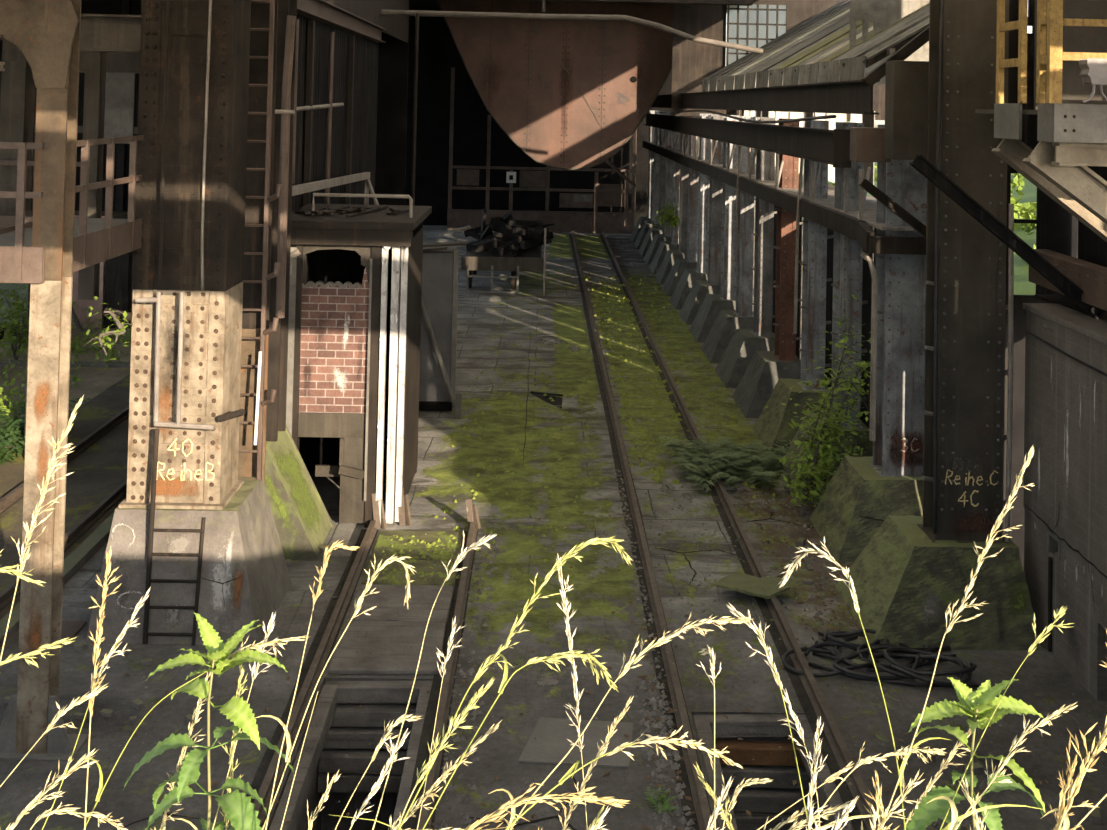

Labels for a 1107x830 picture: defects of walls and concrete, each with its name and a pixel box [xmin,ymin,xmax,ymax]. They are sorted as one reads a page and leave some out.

rust [35,384,49,418]
rust [38,441,48,481]
rust [889,431,924,466]
leakage [1064,398,1081,482]
crack [1025,502,1107,612]
rust [26,617,41,651]